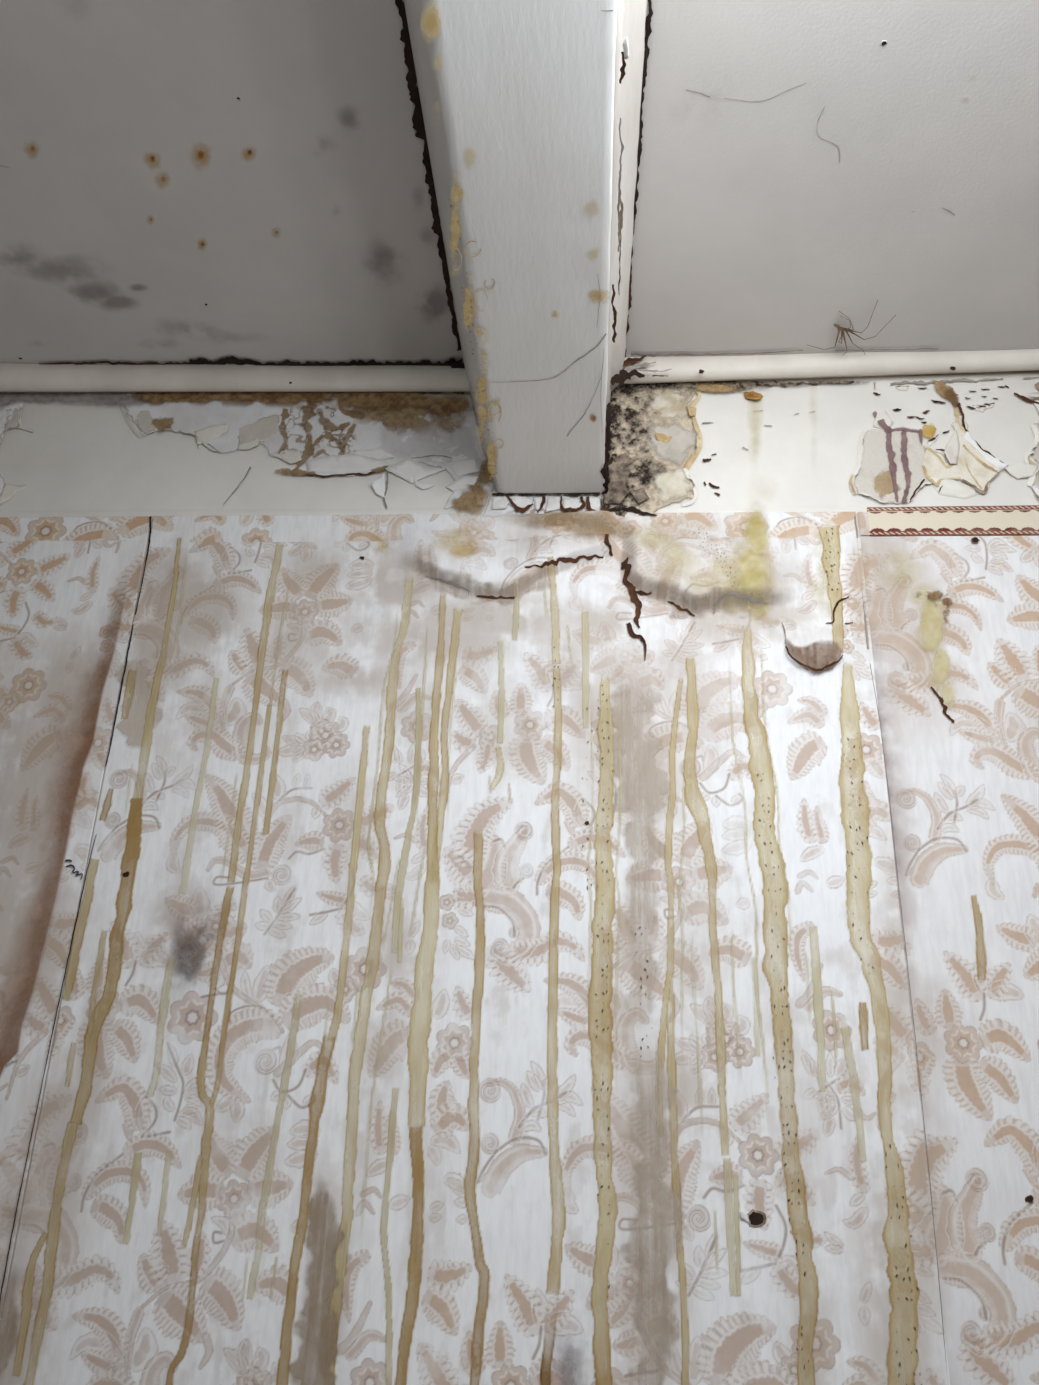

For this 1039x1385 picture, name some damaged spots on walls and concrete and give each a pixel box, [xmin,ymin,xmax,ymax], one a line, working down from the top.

peeling [0,402,34,444]
leakage [0,539,181,1385]
leakage [147,544,288,1385]
leakage [247,557,566,1385]
peeling [120,384,720,517]
crack [425,534,768,659]
peeling [611,118,624,343]
peeling [619,37,629,84]
leakage [582,612,741,1385]
leakage [732,630,819,1385]
leakage [809,526,922,1385]
peeling [849,381,1039,504]